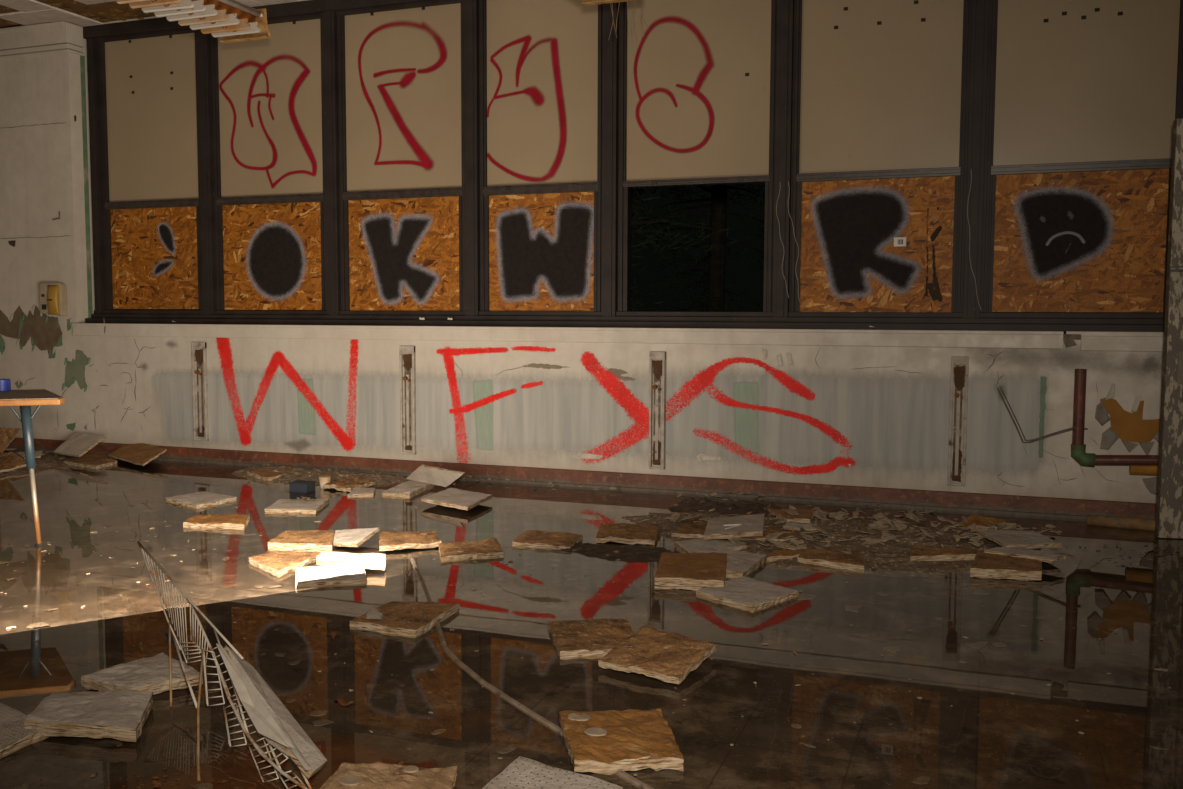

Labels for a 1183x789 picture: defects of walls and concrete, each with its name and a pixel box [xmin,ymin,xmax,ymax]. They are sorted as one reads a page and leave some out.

peeling [0,305,90,392]
peeling [1095,383,1160,455]